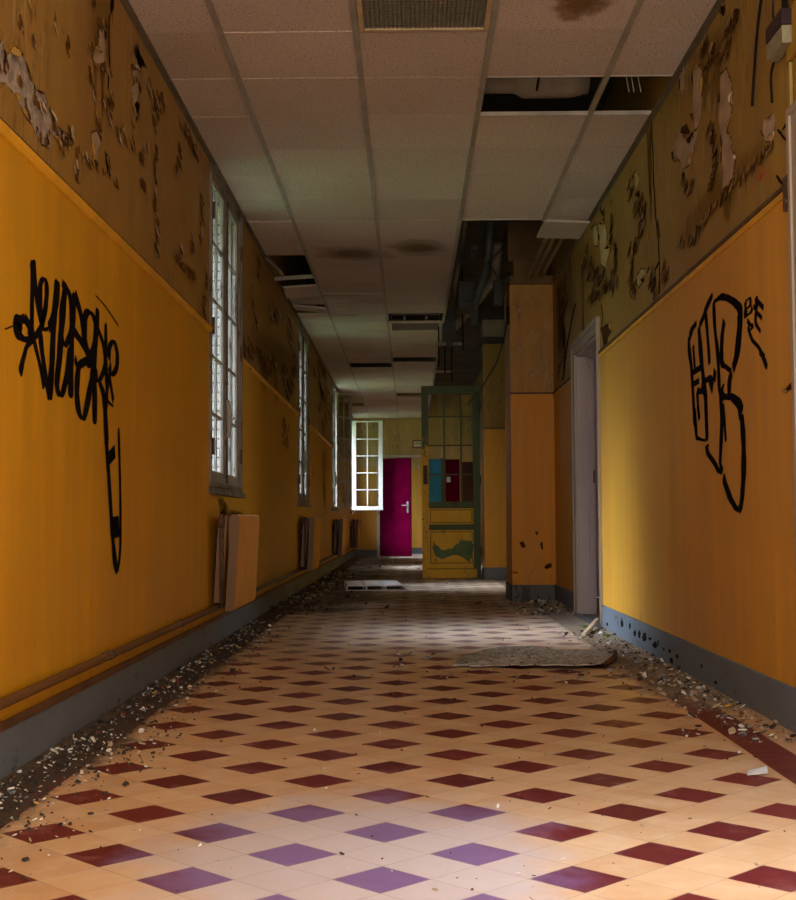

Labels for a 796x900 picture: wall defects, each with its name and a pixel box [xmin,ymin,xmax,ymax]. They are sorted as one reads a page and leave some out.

peeling [0,0,165,258]
peeling [671,3,776,250]
peeling [176,194,209,321]
peeling [582,163,670,307]
spalling [600,321,611,347]
peeling [433,540,474,562]